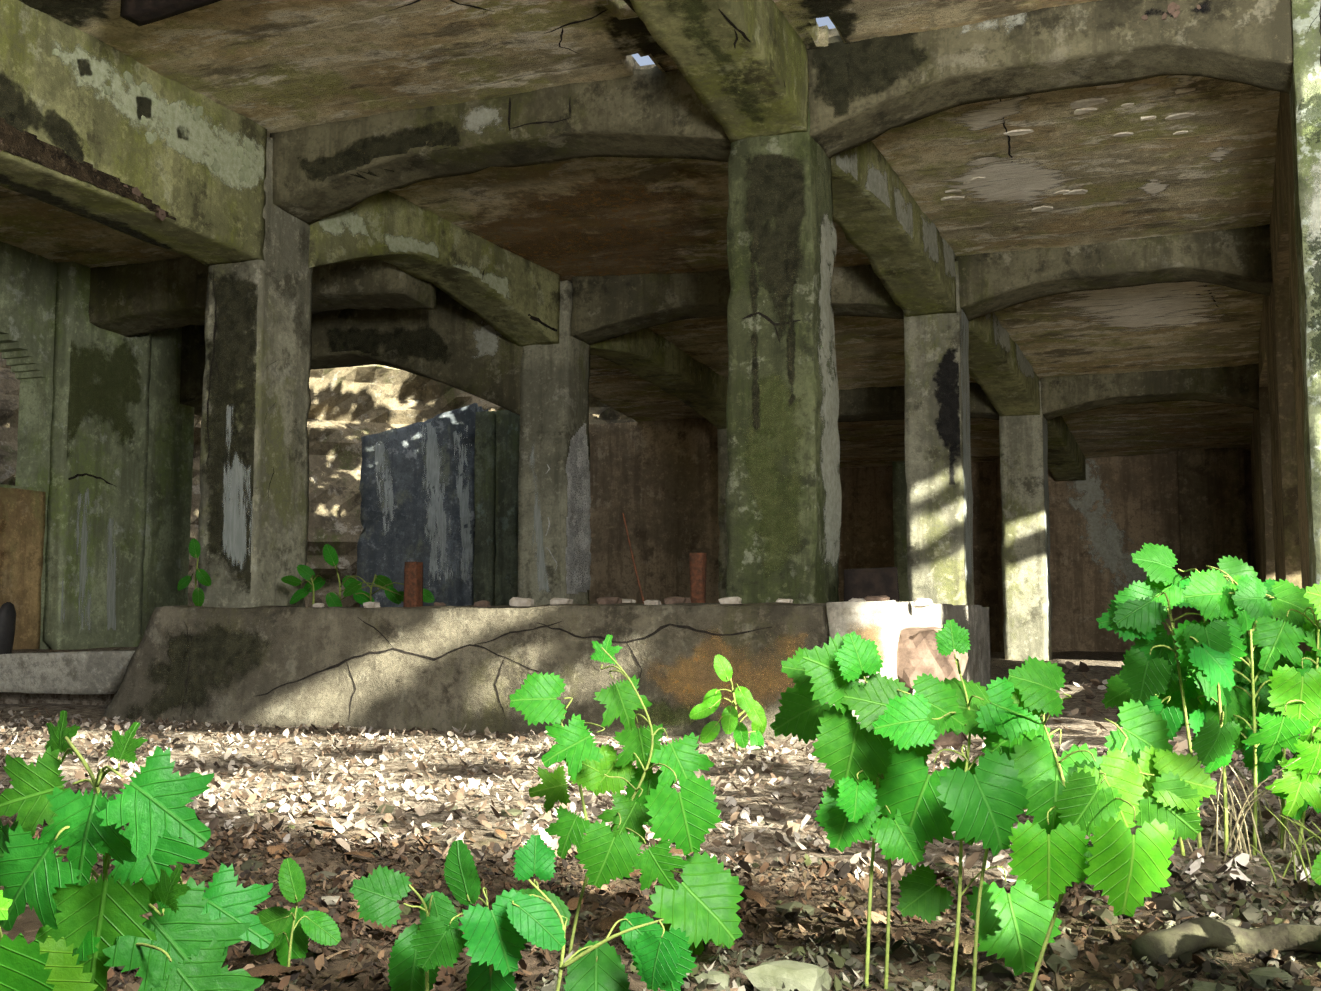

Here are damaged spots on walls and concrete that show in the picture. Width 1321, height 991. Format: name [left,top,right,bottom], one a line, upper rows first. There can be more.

water stain [790,0,927,116]
water stain [0,74,84,164]
water stain [298,107,500,183]
water stain [745,154,805,430]
water stain [818,214,842,566]
water stain [126,623,268,719]
crack [256,618,772,722]